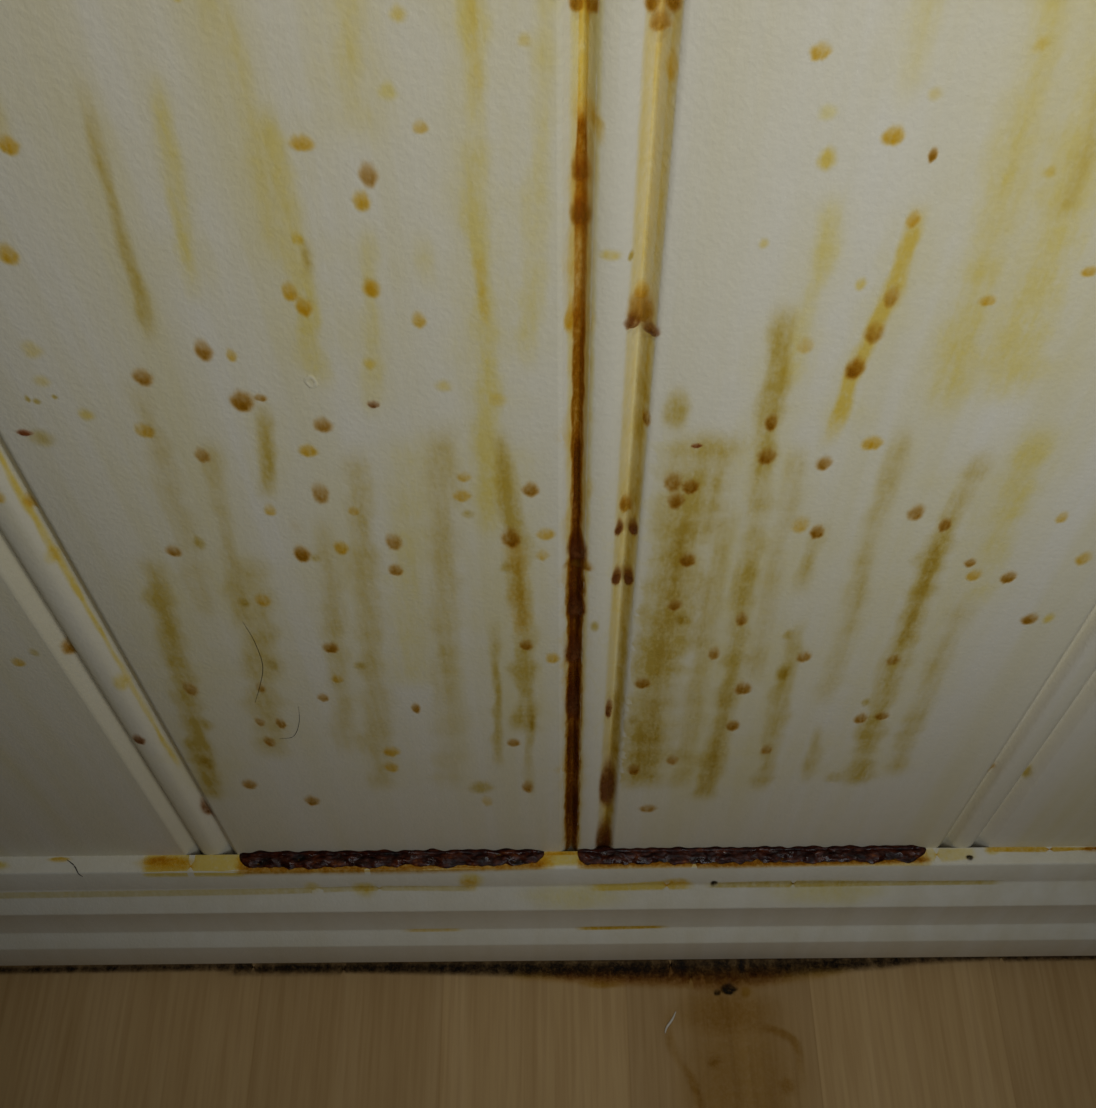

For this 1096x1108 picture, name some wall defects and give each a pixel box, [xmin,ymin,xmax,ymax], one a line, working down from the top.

rust [239,848,544,870]
rust [578,845,926,866]